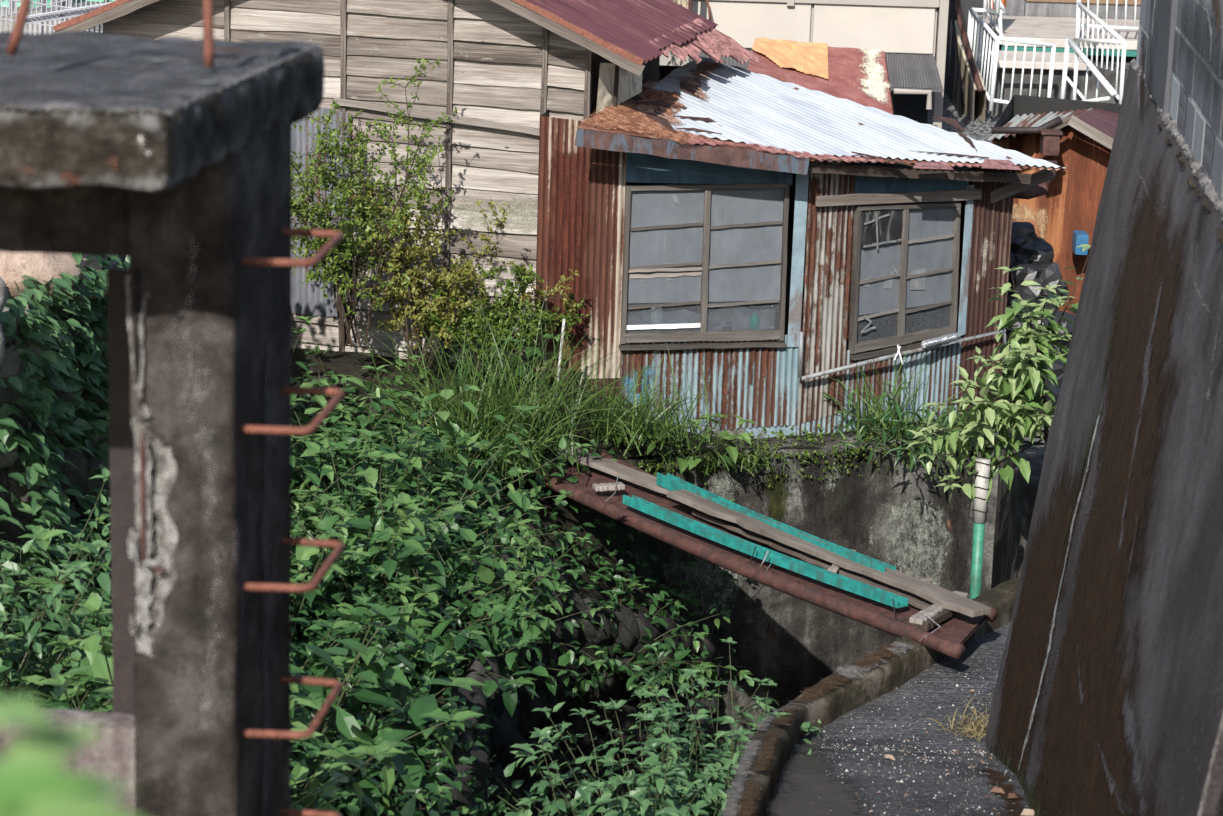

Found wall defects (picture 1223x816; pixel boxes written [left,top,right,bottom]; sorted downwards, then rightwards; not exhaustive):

corrosion [583,61,894,164]
corrosion [549,151,593,365]
corrosion [799,177,855,405]
spalling [127,409,178,658]
water stain [760,455,868,554]
water stain [950,468,973,592]
water stain [977,142,1202,816]